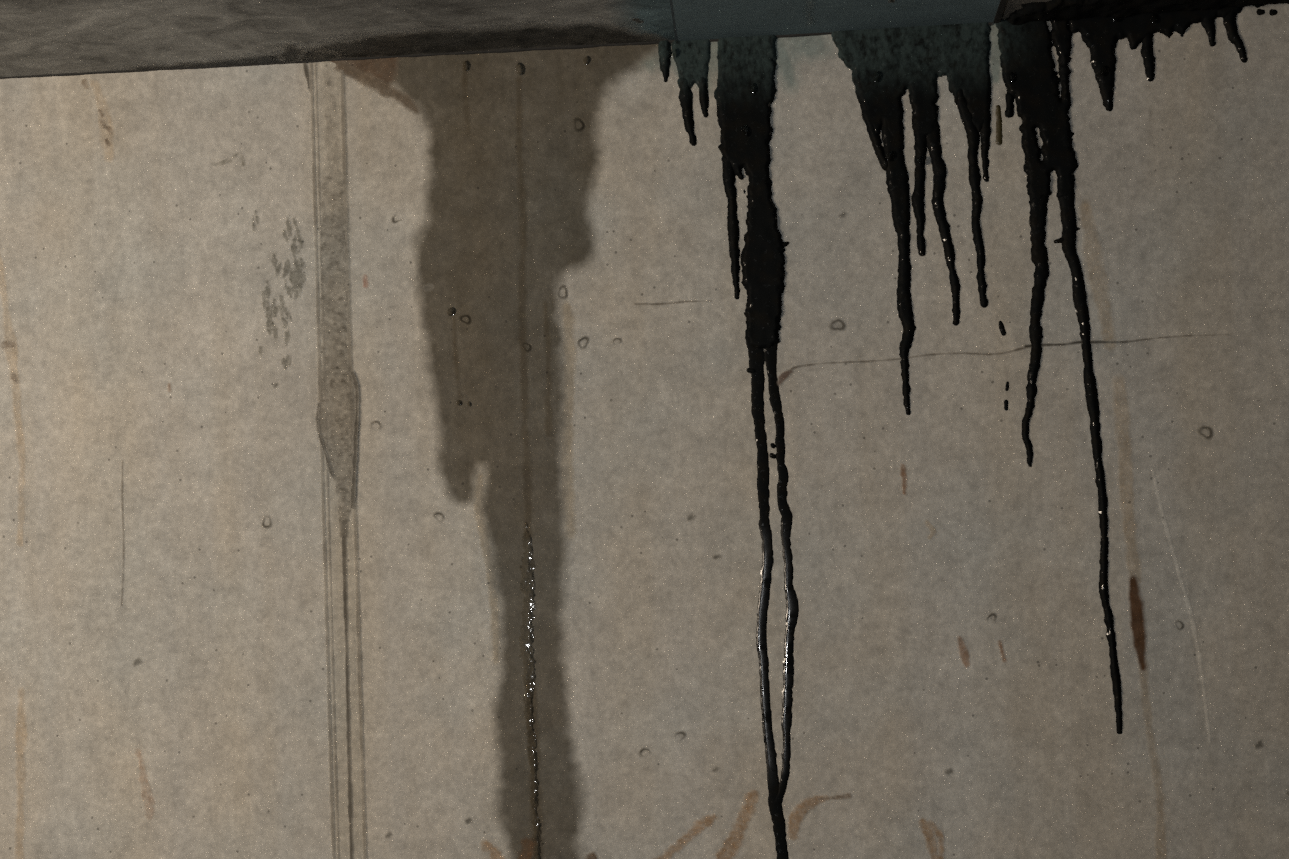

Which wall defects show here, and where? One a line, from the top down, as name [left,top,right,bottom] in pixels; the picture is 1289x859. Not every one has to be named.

leakage [708,42,718,88]
leakage [775,35,828,88]
leakage [989,23,1001,83]
leakage [133,24,678,859]
corrosion [1115,384,1147,694]
corrosion [657,815,716,859]
corrosion [716,791,758,859]
corrosion [788,793,851,839]